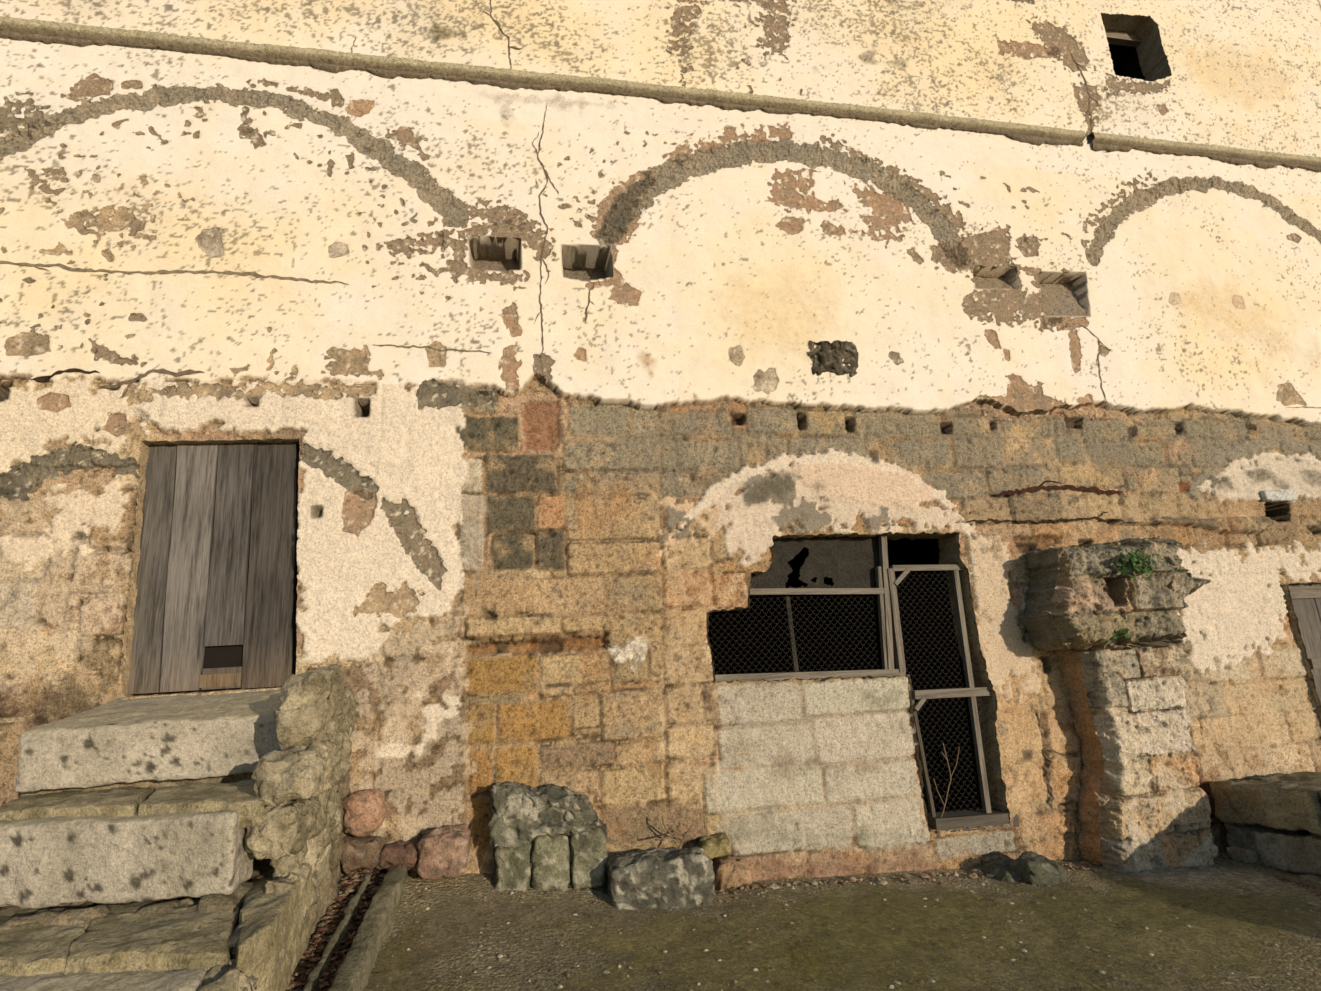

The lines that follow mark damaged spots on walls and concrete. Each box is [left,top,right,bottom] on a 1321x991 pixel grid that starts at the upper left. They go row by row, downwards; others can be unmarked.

crack [483,0,524,69]
flaking render [666,0,797,87]
flaking render [997,0,1171,144]
flaking render [0,305,63,357]
flaking render [37,392,71,412]
flaking render [0,73,208,281]
flaking render [195,227,225,258]
flaking render [80,302,384,436]
crack [532,105,559,378]
flaking render [767,134,1162,424]
flaking render [0,441,139,501]
flaking render [300,443,448,618]